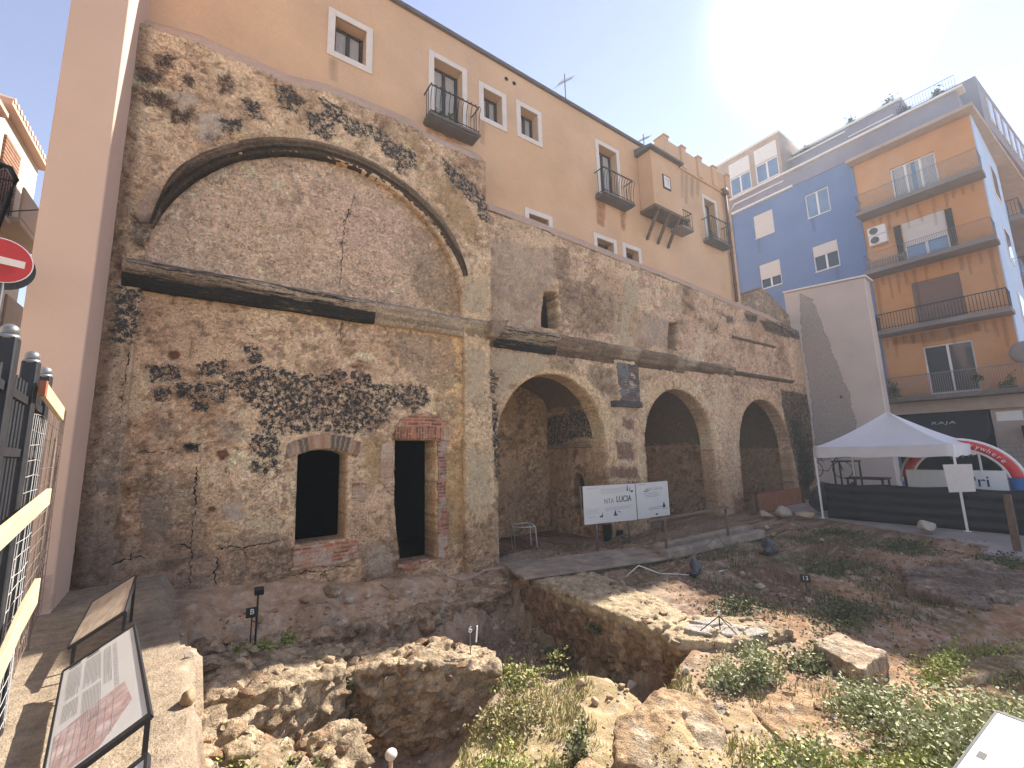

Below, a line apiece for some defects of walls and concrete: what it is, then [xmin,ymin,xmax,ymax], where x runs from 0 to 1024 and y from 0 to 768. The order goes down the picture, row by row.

crack [338,196,359,277]
flaking render [780,294,857,486]
crack [136,441,289,586]